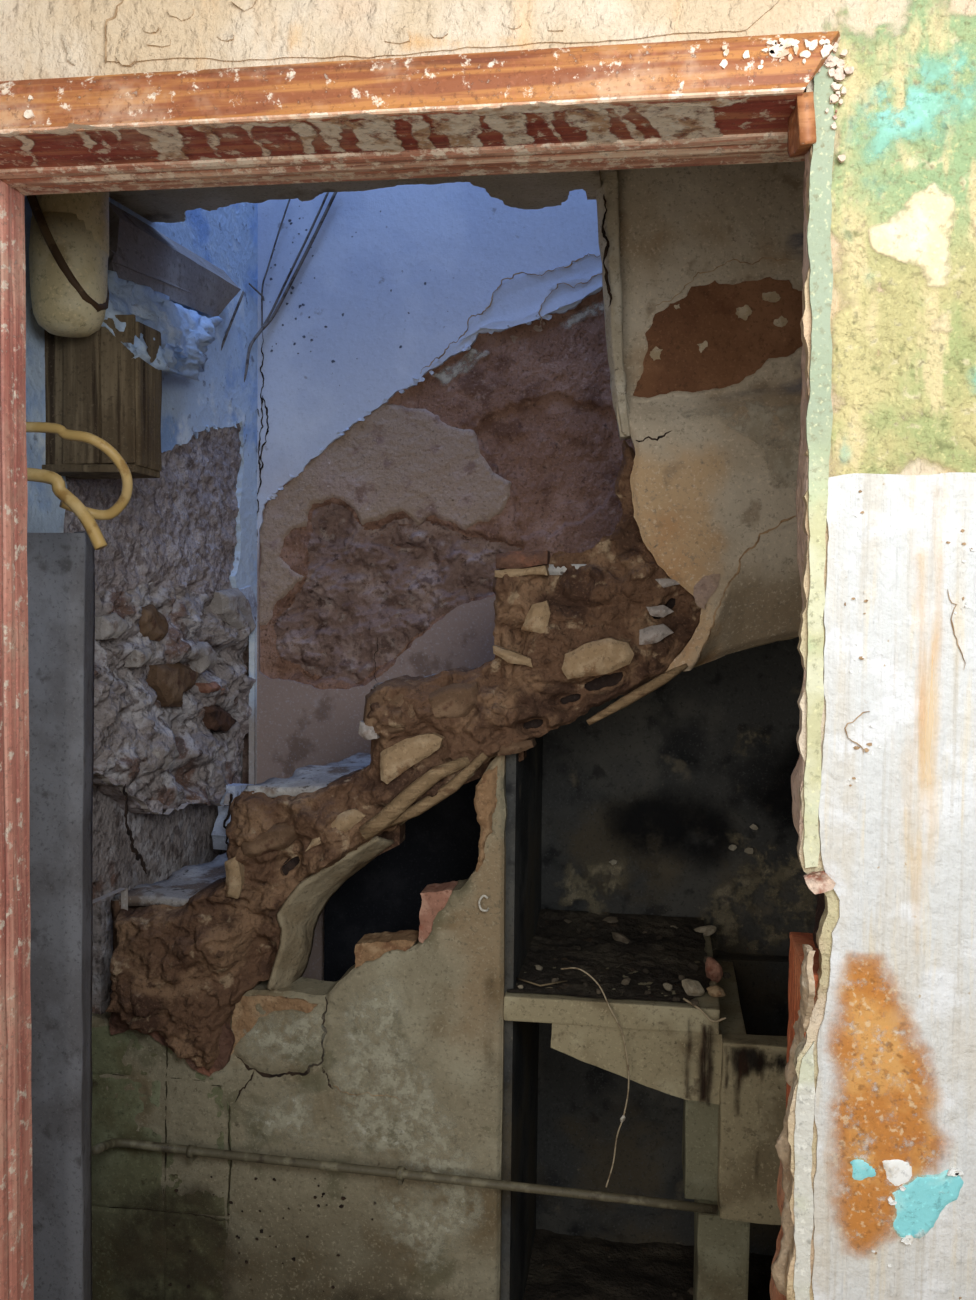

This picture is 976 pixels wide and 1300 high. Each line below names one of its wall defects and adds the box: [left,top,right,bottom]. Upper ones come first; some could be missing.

crack [421,195,612,372]
peeling [107,0,976,476]
spalling [63,252,803,814]
crack [698,516,796,662]
spalling [282,856,300,875]
flaking render [354,881,458,968]
spalling [474,766,498,872]
peeling [563,859,621,912]
flaking render [230,995,318,1056]
crack [235,997,403,1104]
peeling [850,1157,964,1245]